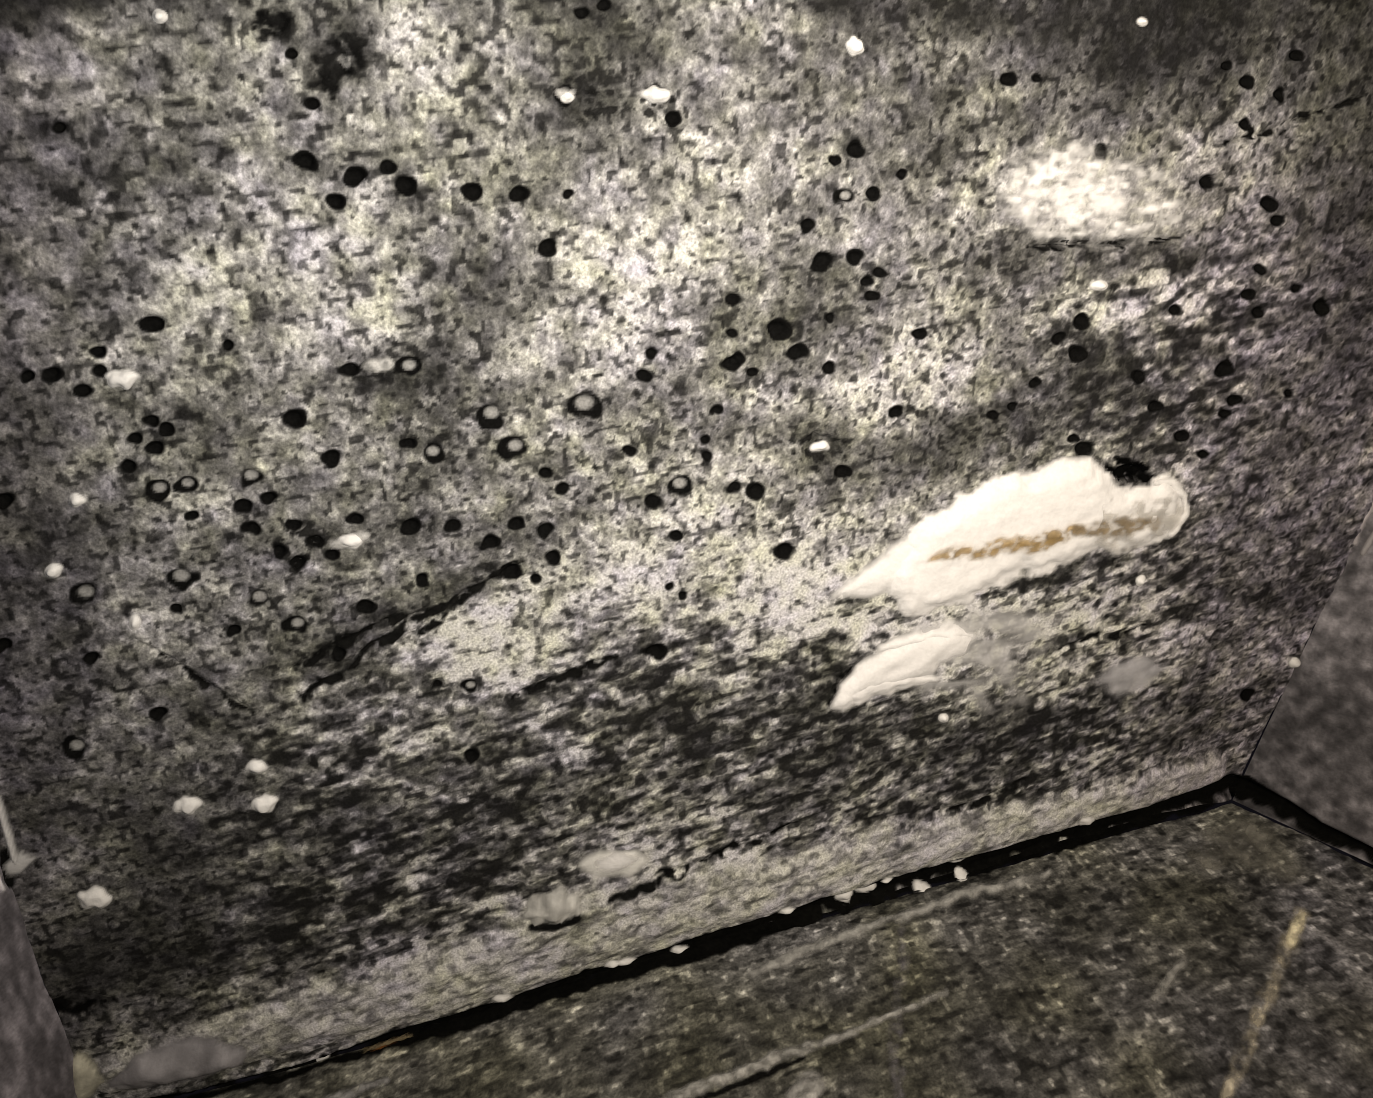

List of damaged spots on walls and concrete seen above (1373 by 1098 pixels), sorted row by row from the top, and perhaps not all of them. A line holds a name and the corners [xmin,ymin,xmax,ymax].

crack [296,560,523,703]
damp [832,457,1189,710]
rust [931,518,1152,560]